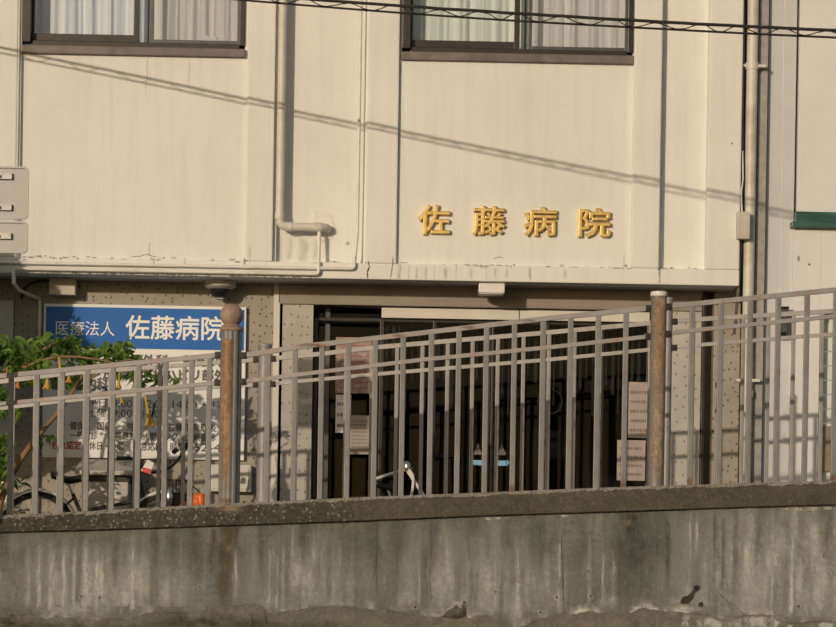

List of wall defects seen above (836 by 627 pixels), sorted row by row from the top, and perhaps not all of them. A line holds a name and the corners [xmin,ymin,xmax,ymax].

damp [27,548,150,618]
damp [212,527,238,596]
damp [267,537,317,611]
damp [401,542,455,610]
damp [477,545,566,619]
damp [574,553,616,614]
peeling [442,585,836,627]
damp [704,506,836,620]